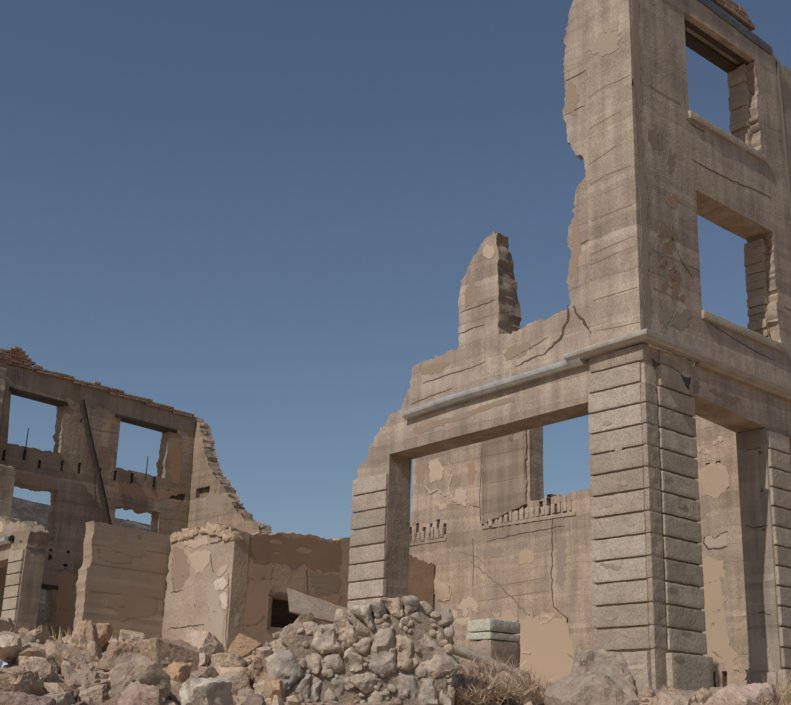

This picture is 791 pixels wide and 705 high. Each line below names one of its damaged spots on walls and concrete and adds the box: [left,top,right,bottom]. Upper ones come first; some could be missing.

crack [515,305,570,367]
spalling [424,458,468,510]
spalling [695,435,730,499]
crack [459,447,569,619]
crack [210,539,229,653]